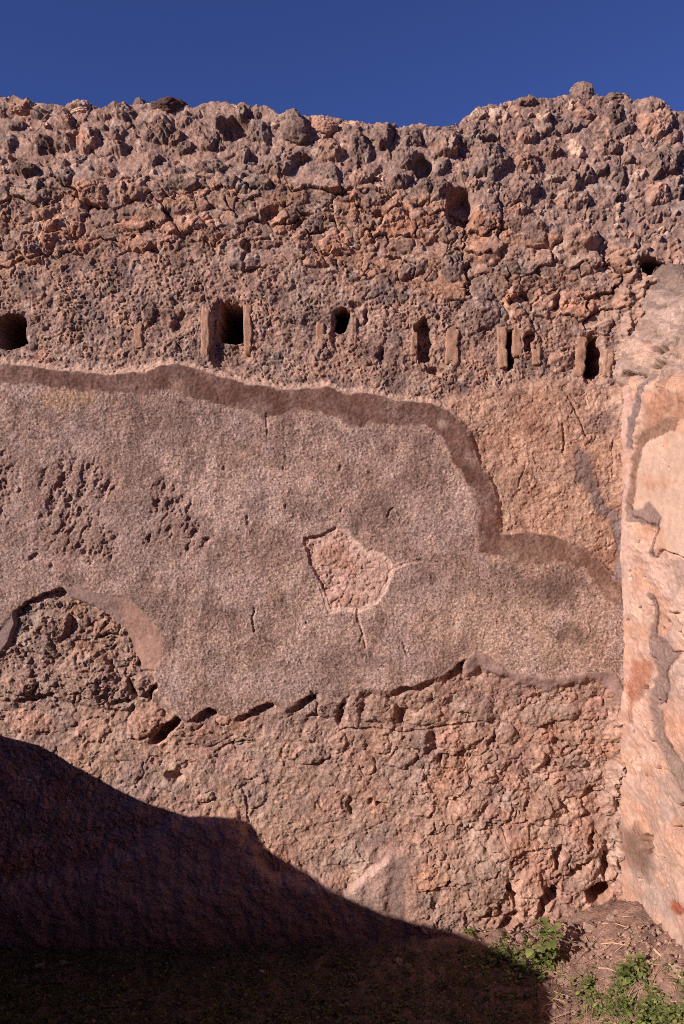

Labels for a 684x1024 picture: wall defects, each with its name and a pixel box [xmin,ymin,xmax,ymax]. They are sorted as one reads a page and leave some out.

flaking render [0,376,684,949]
crack [355,608,368,651]